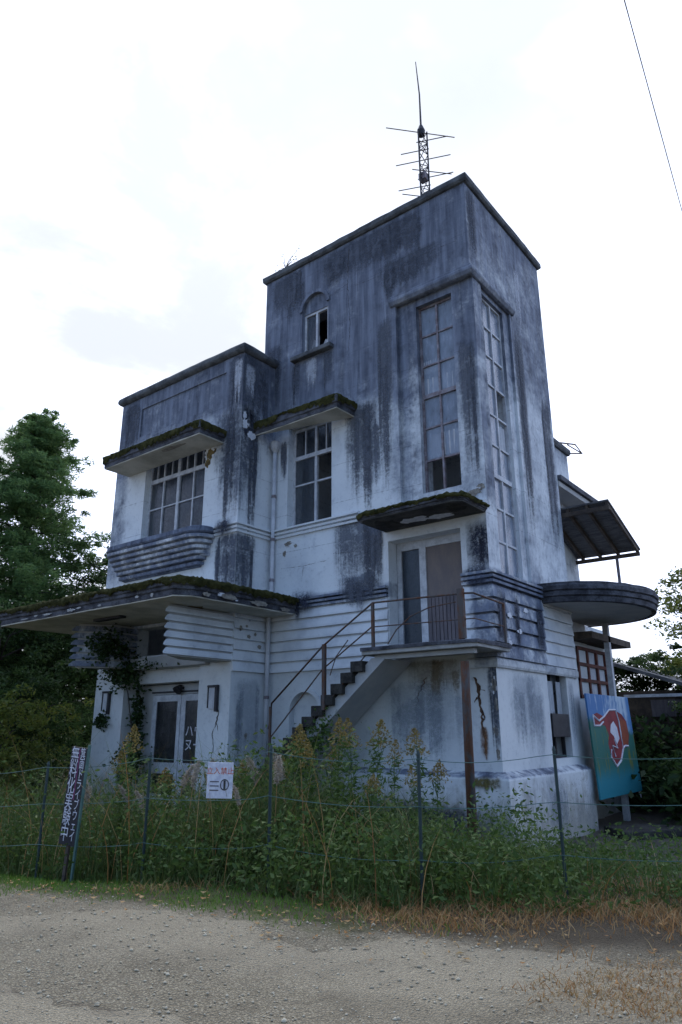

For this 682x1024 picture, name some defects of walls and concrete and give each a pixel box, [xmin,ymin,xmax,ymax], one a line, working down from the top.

damp [324,213,436,292]
damp [466,191,476,249]
damp [214,347,280,588]
spalling [242,411,256,441]
damp [292,351,332,404]
damp [346,321,391,499]
damp [459,344,479,456]
damp [335,519,404,605]